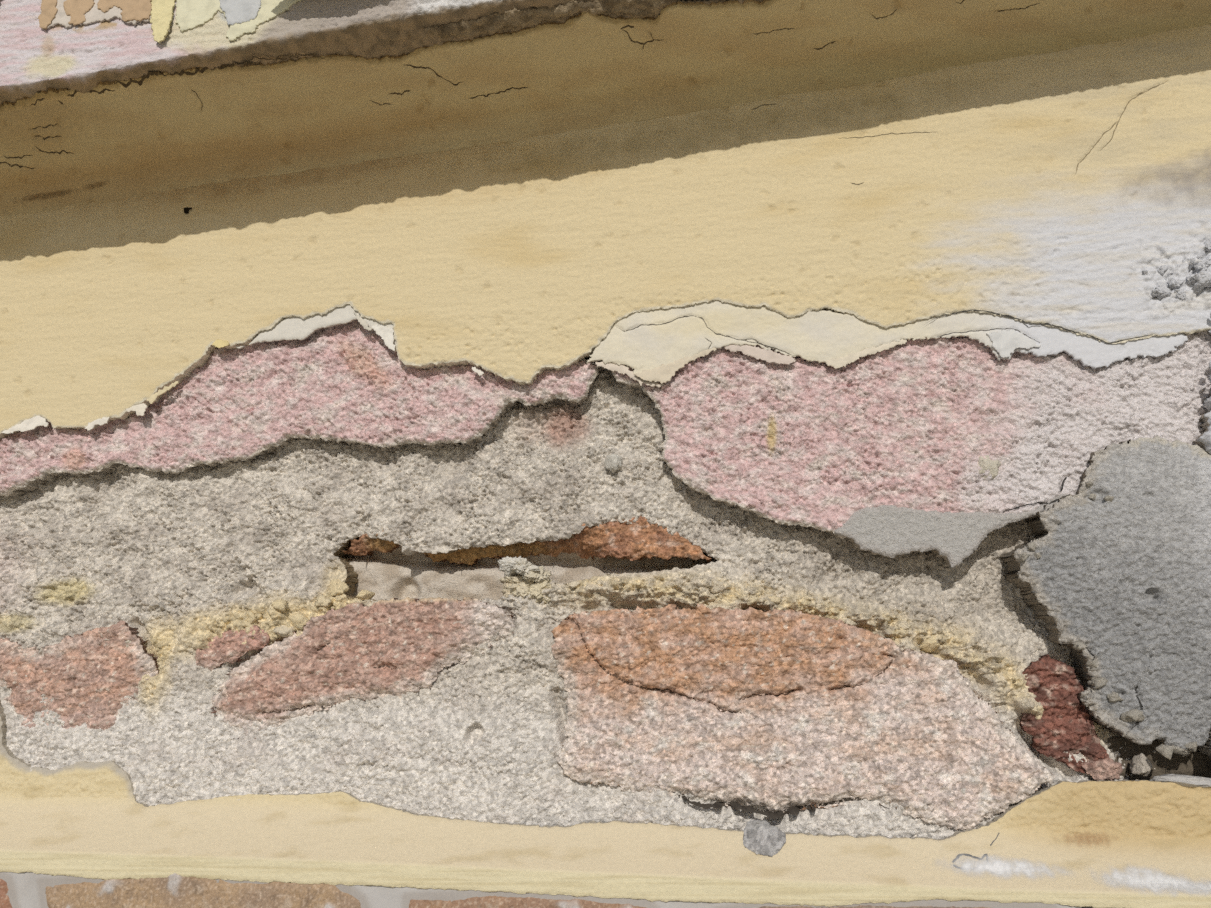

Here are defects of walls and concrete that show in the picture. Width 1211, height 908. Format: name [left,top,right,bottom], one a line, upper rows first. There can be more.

peeling [38,0,303,43]
crack [1075,83,1163,174]
spalling [0,300,1211,857]